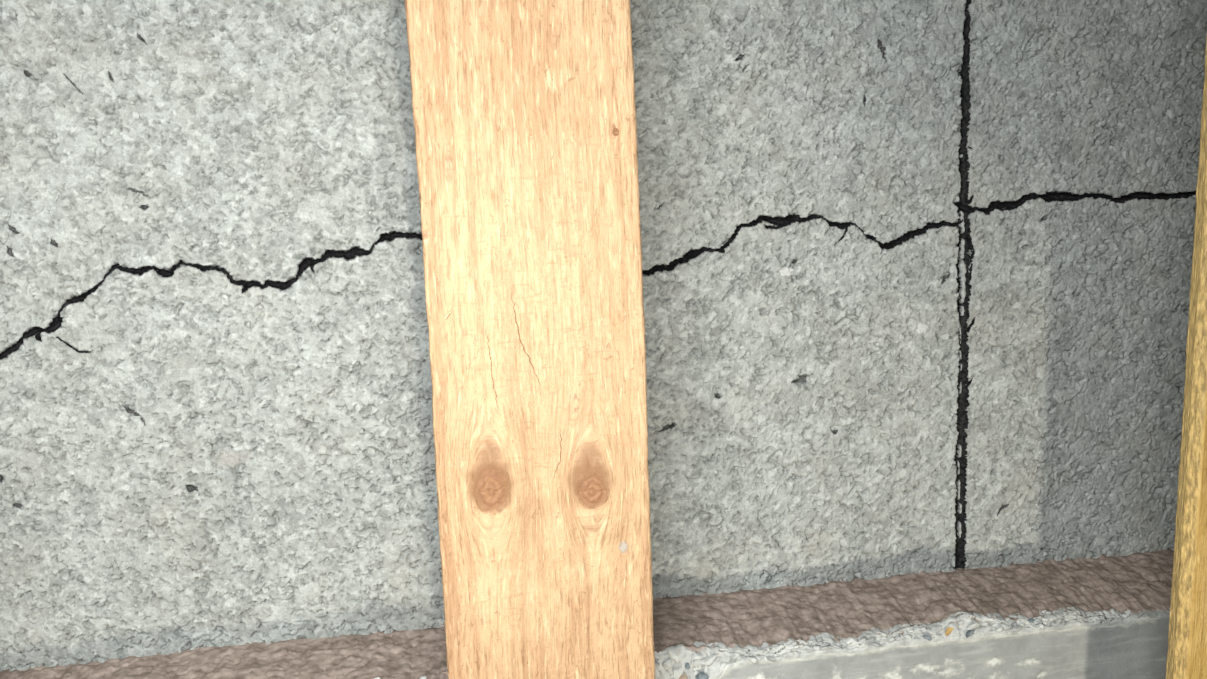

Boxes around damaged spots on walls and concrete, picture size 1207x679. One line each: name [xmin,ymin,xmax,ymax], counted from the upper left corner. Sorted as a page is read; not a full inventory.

crack [127,188,149,210]
crack [642,191,1196,276]
crack [0,232,422,359]
crack [123,405,146,426]